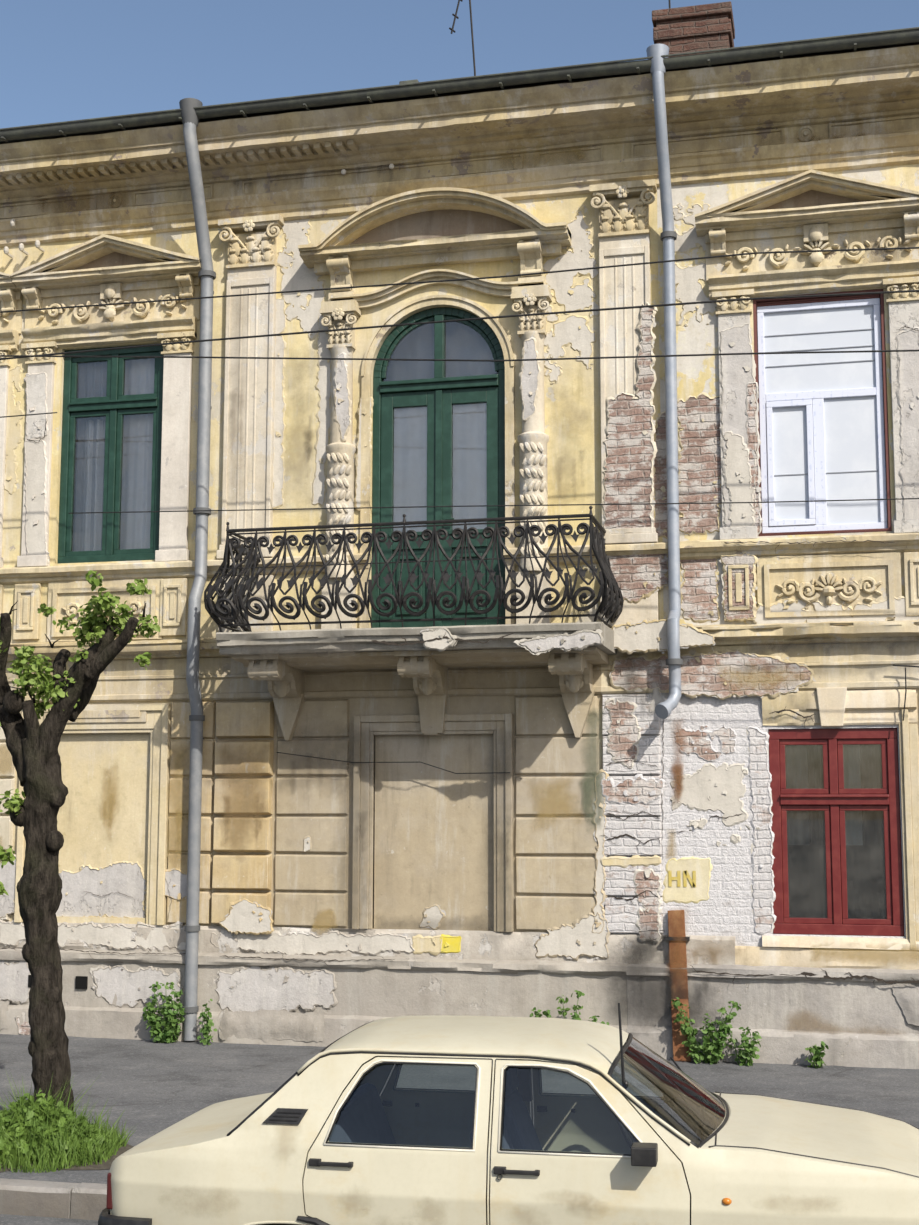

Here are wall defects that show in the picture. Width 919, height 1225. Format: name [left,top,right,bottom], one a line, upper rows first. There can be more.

peeling [273,219,374,511]
peeling [519,204,600,421]
flaking render [534,203,919,961]
peeling [0,853,31,1035]
peeling [56,861,187,1009]
peeling [210,899,461,1012]